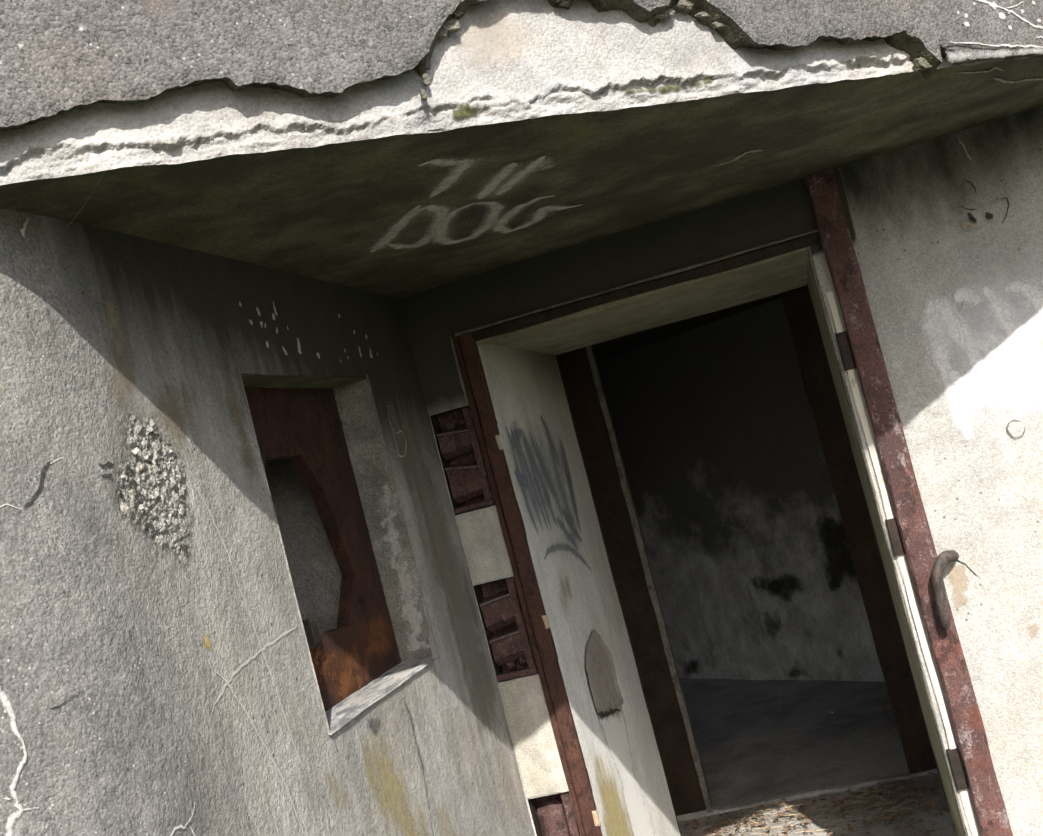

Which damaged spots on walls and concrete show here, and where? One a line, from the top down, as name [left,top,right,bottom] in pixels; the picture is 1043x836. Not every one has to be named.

crack [946,0,1043,49]
spalling [0,0,1043,185]
crack [0,457,63,509]
spalling [99,412,193,572]
corrosion [310,612,394,697]
spalling [585,629,624,720]
crack [0,686,38,836]
crack [170,801,196,836]